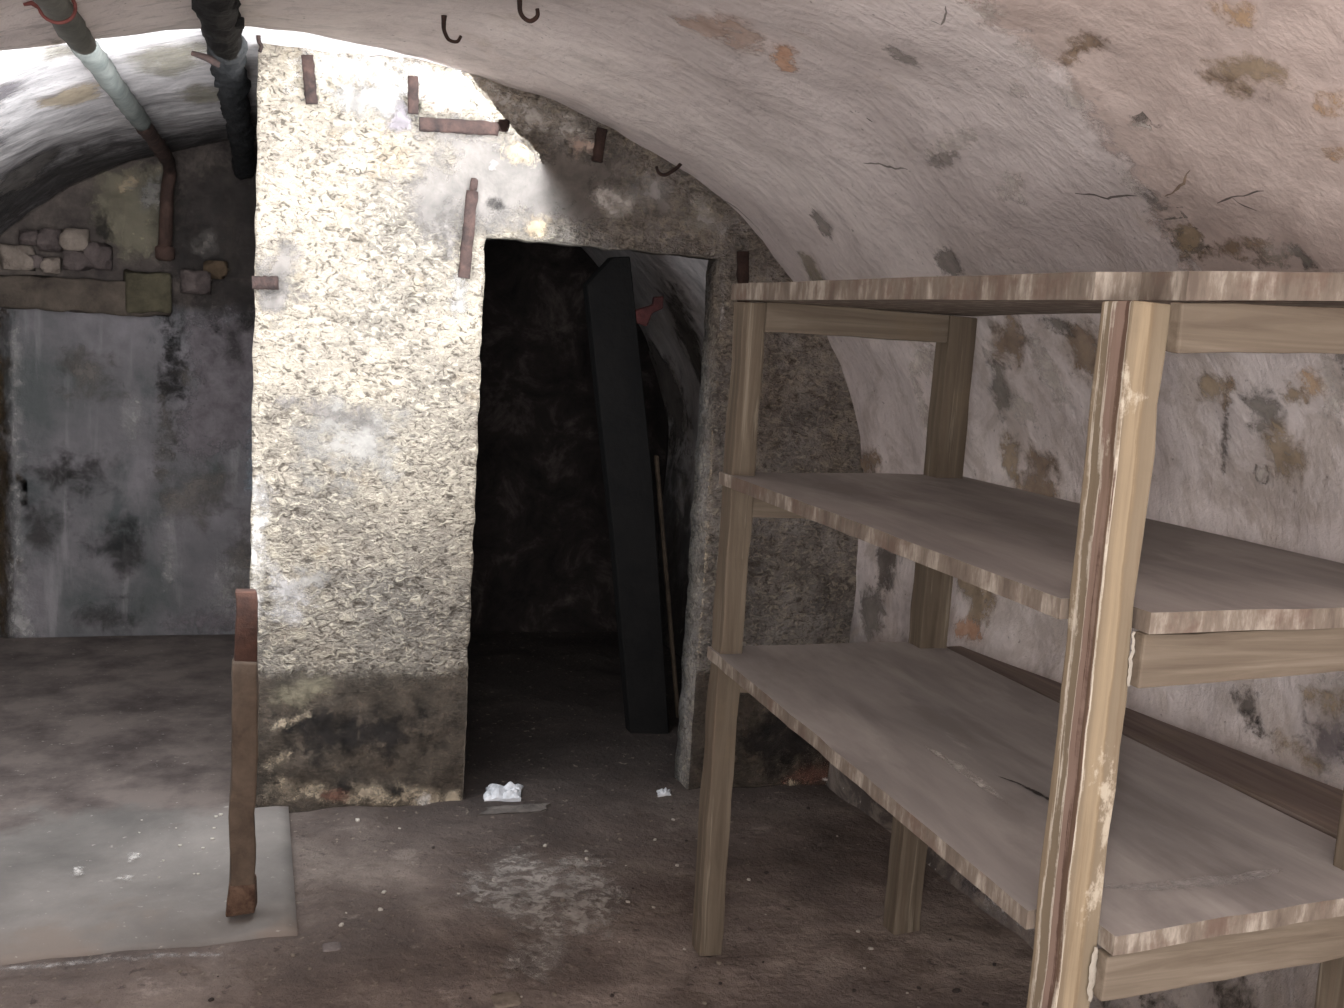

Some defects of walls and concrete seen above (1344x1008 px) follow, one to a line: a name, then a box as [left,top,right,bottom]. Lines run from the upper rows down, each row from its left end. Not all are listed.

flaking render [675,17,796,72]
peeling [970,0,1344,273]
crack [1075,170,1190,200]
crack [1217,191,1260,211]
water stain [155,322,225,530]
water stain [1221,392,1304,477]
corrosion [0,356,21,637]
water stain [8,483,49,636]
water stain [226,531,251,594]
water stain [255,664,468,813]
water stain [1213,978,1255,1008]